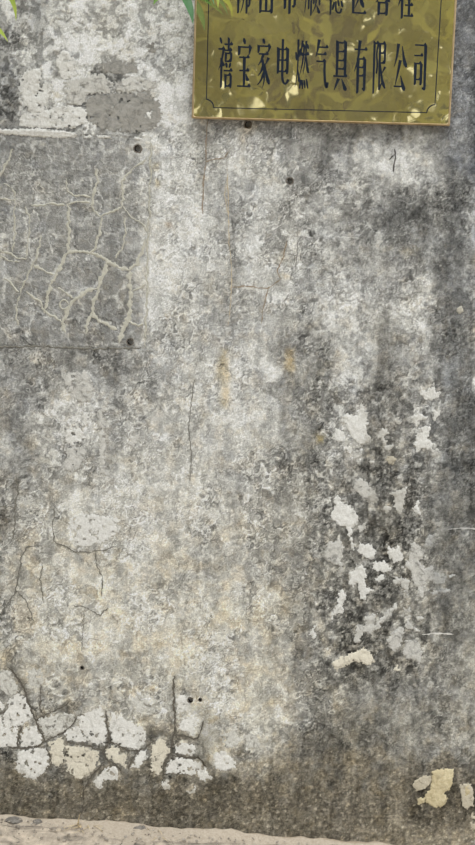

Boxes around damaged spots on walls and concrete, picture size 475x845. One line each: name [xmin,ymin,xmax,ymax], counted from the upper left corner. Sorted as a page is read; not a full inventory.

peeling [334,401,397,465]
peeling [394,383,442,458]
peeling [354,478,421,515]
crack [0,667,207,800]